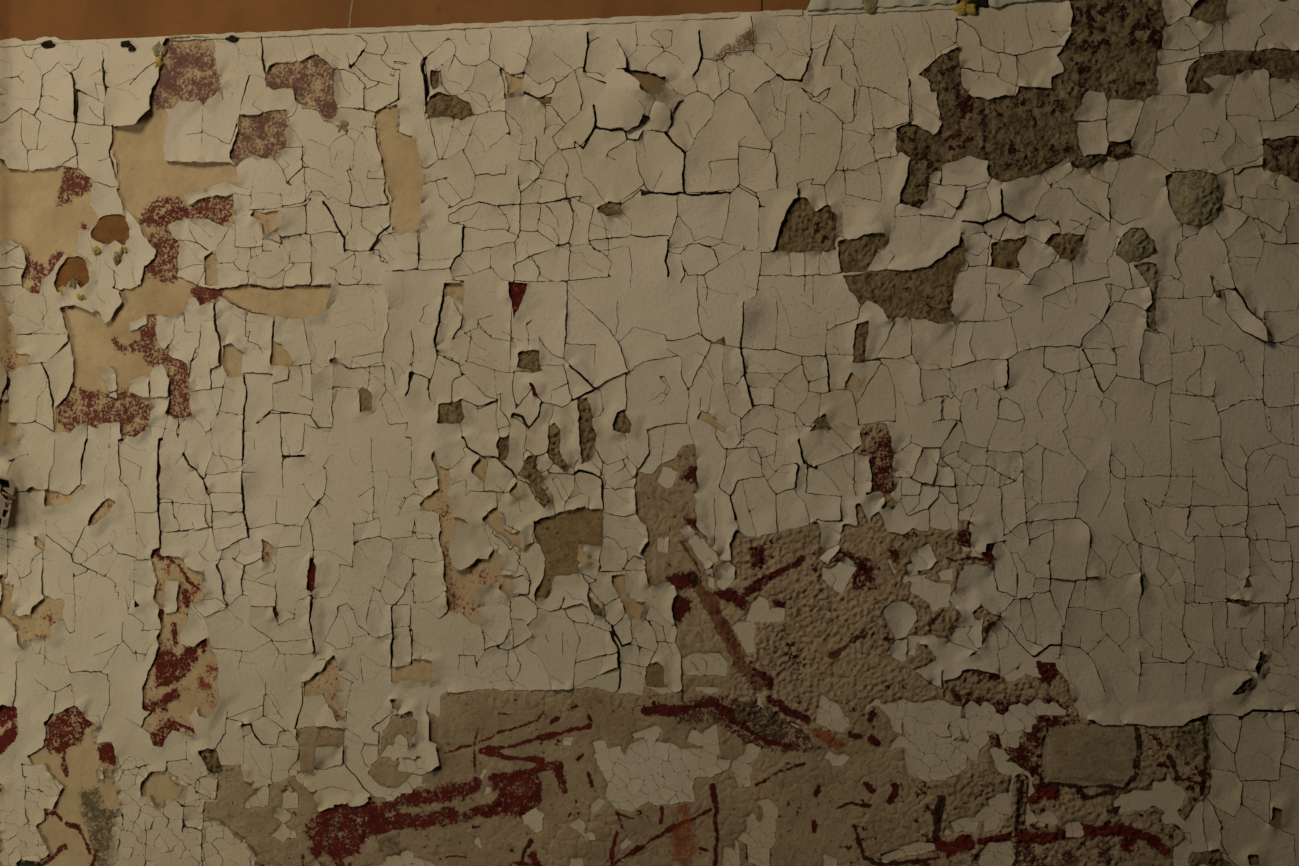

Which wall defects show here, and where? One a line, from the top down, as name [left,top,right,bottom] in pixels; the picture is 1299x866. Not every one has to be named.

crack [4,48,148,187]
peeling [668,0,1299,446]
peeling [0,396,21,444]
crack [0,249,54,432]
crack [103,0,1299,722]
peeling [159,499,179,532]
crack [2,527,157,720]
peeling [0,554,220,866]
flaking render [645,659,666,688]
peeling [650,621,665,641]
crack [851,794,946,866]
crack [1190,709,1299,866]